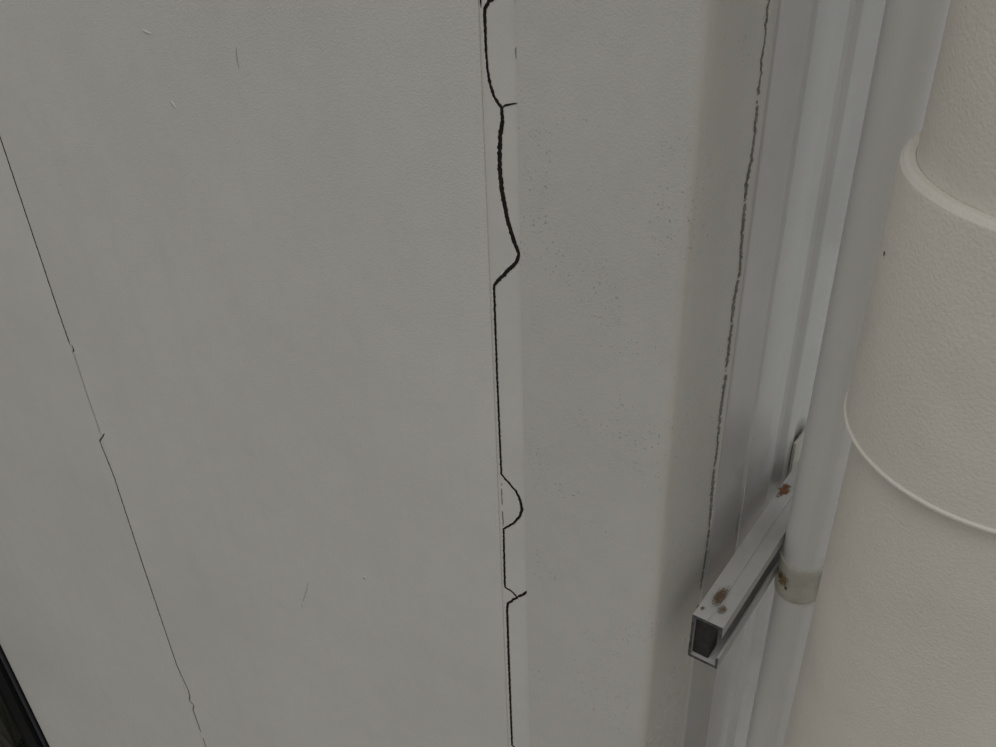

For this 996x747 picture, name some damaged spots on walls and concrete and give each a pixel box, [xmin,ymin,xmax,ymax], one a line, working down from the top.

crack [0,137,206,746]
crack [480,0,527,747]
corrosion [701,586,731,614]